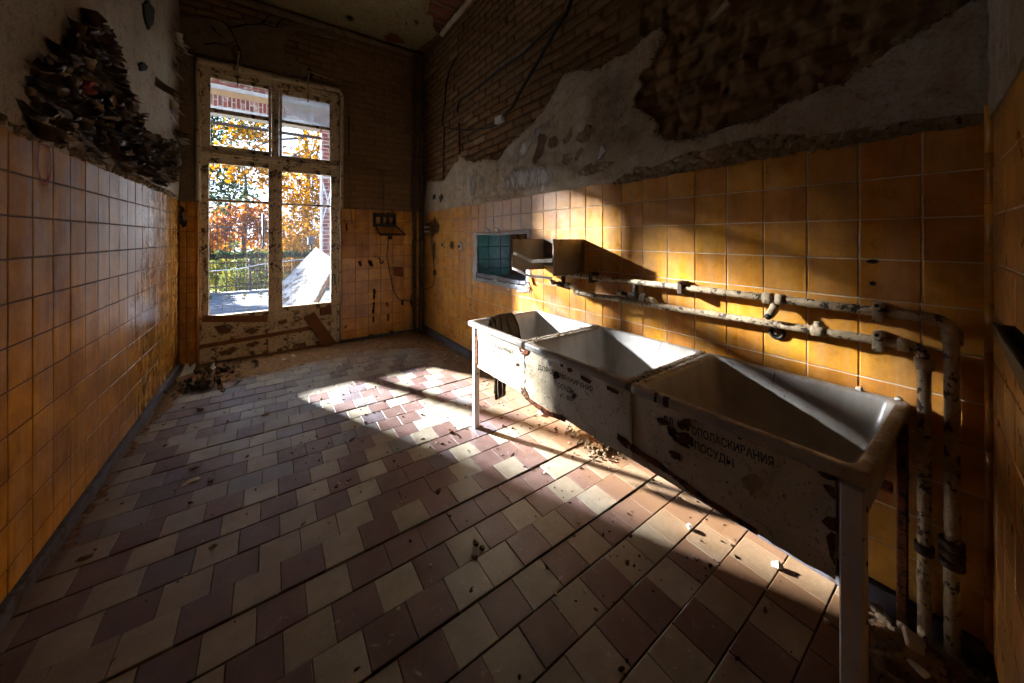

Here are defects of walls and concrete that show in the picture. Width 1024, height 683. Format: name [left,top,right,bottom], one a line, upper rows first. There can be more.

peeling [0,7,195,228]
spalling [142,0,155,30]
flaking render [423,0,985,205]